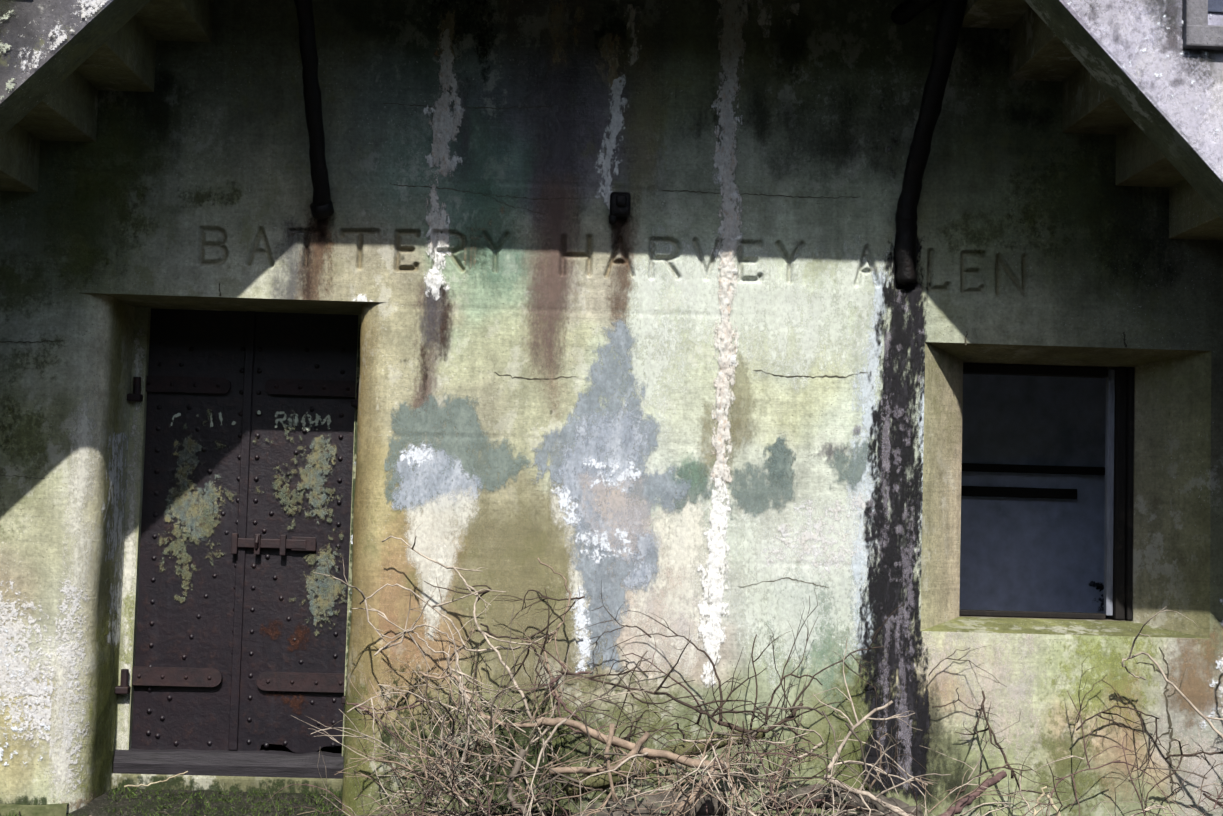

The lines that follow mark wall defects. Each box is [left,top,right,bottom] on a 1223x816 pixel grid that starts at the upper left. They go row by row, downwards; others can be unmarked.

water stain [423,0,490,300]
water stain [595,4,641,215]
corrosion [413,287,451,411]
water stain [628,0,924,791]
peeling [157,424,234,603]
peeling [252,422,353,636]
water stain [50,661,84,809]
water stain [920,697,963,797]